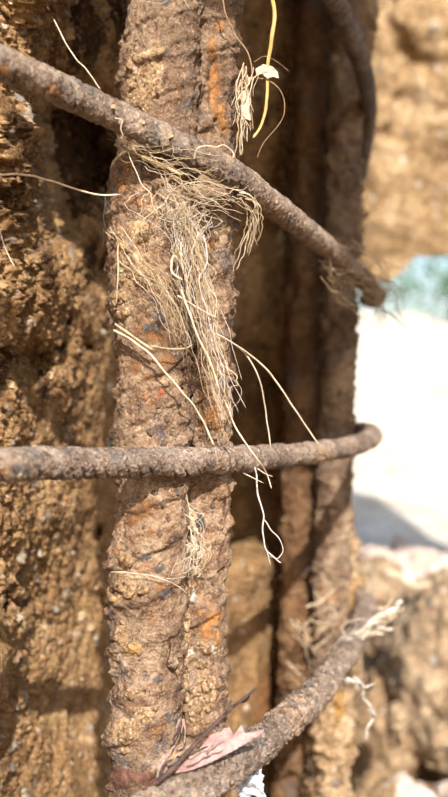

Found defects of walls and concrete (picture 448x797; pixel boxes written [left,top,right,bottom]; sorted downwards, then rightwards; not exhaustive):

spalling [114,0,245,158]
corrosion [209,65,225,132]
corrosion [279,0,298,174]
spalling [288,0,367,259]
spalling [103,132,240,449]
spalling [281,235,360,444]
corrosion [129,488,174,542]
spalling [78,473,237,797]
corrosion [199,611,221,644]
corrosion [257,673,277,723]
corrosion [270,469,283,516]
spalling [274,455,357,708]